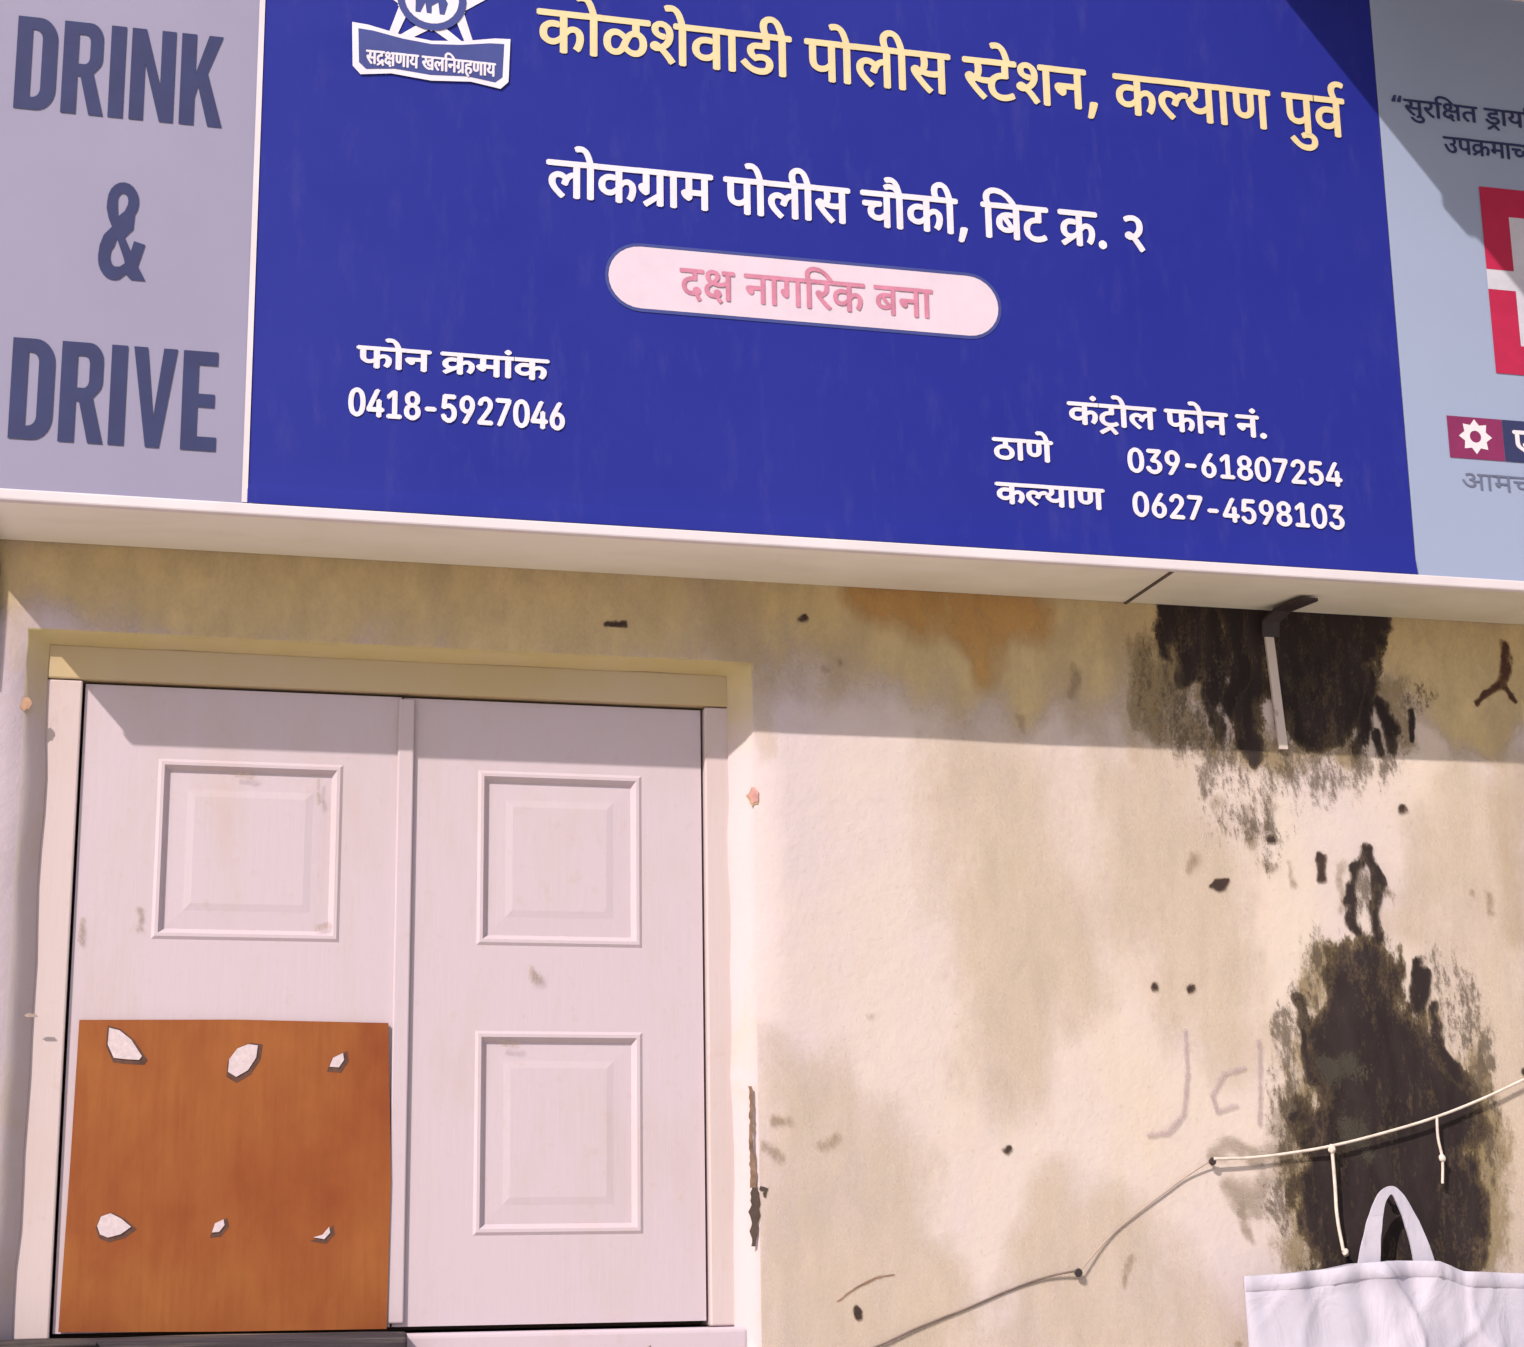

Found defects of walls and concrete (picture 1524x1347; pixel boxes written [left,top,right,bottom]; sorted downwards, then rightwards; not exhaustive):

leakage [0,539,1524,873]
leakage [1263,843,1524,1272]